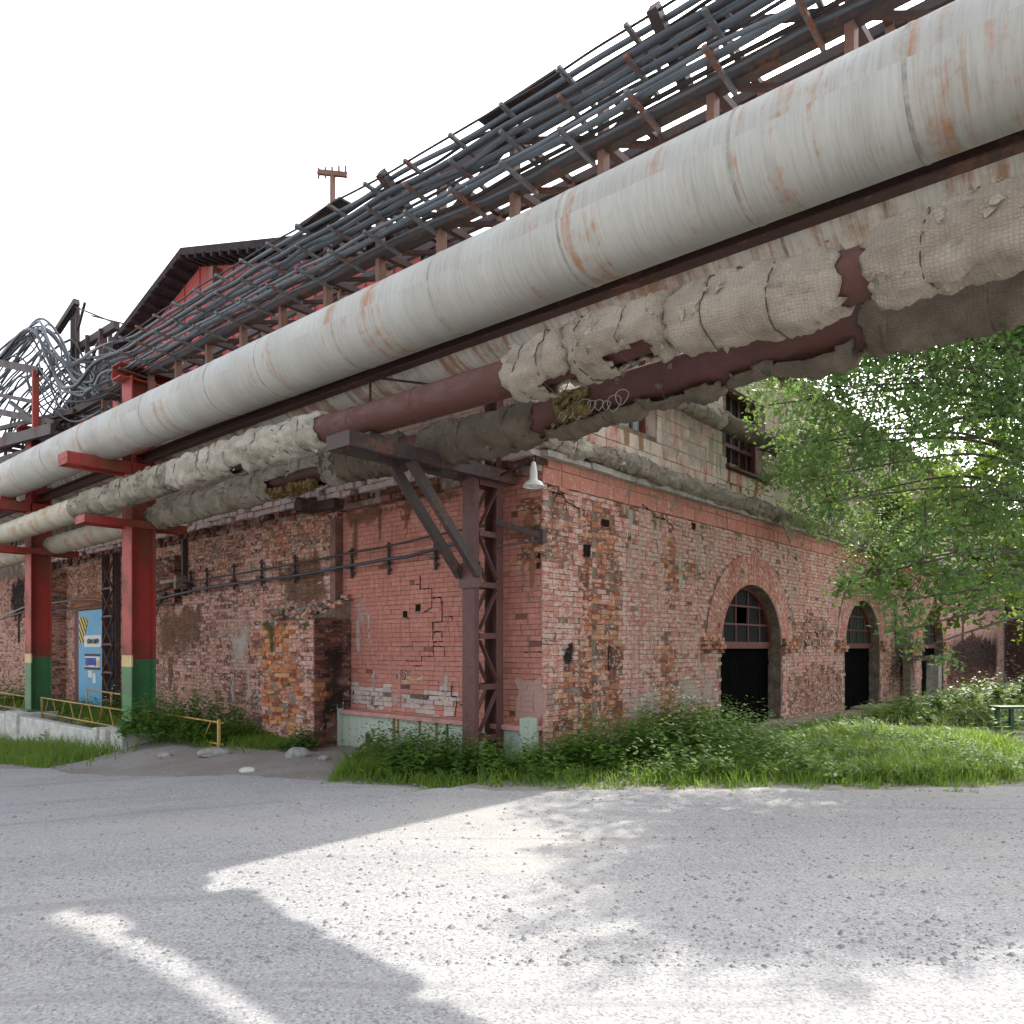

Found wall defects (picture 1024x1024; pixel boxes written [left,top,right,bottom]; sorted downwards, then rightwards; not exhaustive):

crack [396,580,452,666]
spalling [351,669,459,717]
crack [442,685,462,745]